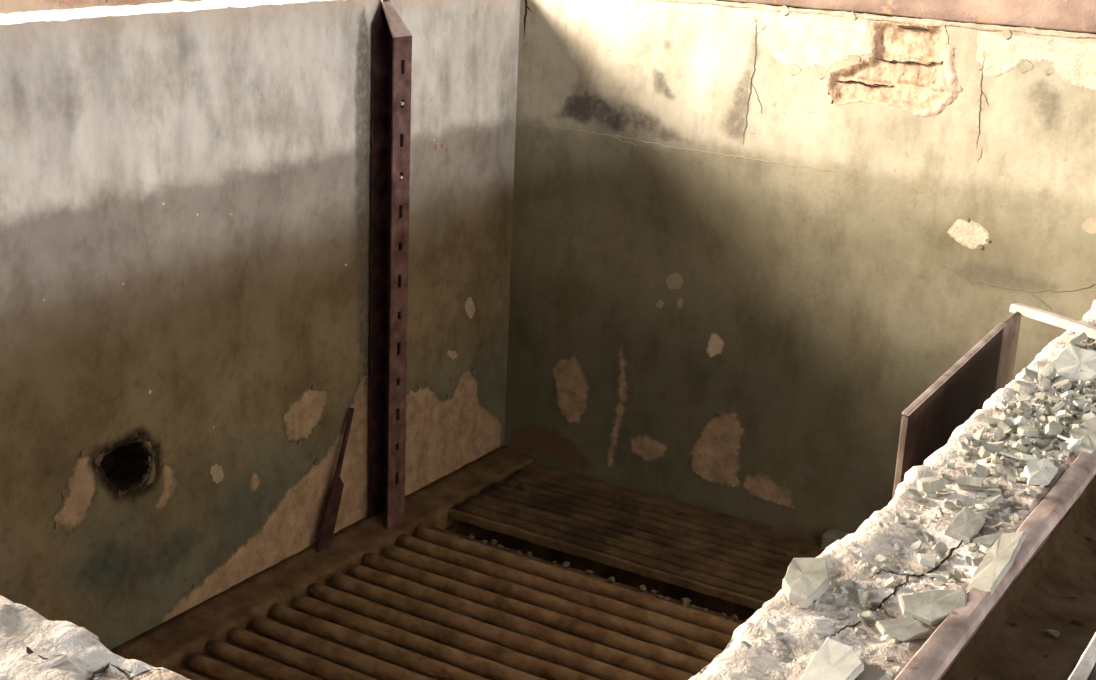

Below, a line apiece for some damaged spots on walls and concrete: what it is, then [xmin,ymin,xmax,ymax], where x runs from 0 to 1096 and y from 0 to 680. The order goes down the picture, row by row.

leakage [569,93,672,138]
crack [518,19,839,173]
flaking render [756,5,962,117]
flaking render [972,30,1096,92]
flaking render [947,218,990,250]
flaking render [52,447,101,538]
flaking render [157,373,370,626]
flaking render [405,368,503,496]
flaking render [550,353,592,428]
flaking render [688,409,797,511]
flaking render [782,322,1096,650]
crack [831,535,984,637]